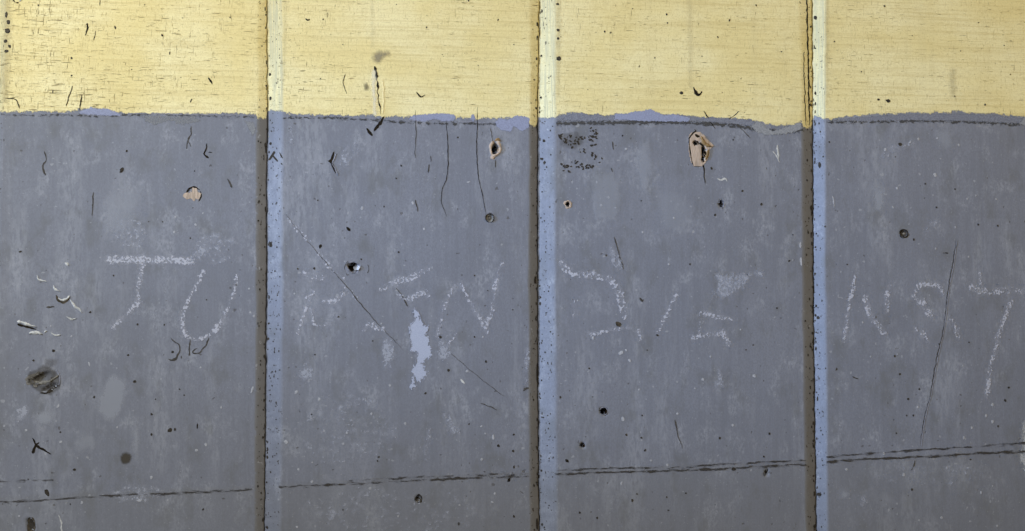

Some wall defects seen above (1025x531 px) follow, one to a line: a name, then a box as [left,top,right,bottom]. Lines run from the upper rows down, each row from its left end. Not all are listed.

peeling [558,109,803,173]
peeling [408,307,442,394]
crack [920,245,957,444]